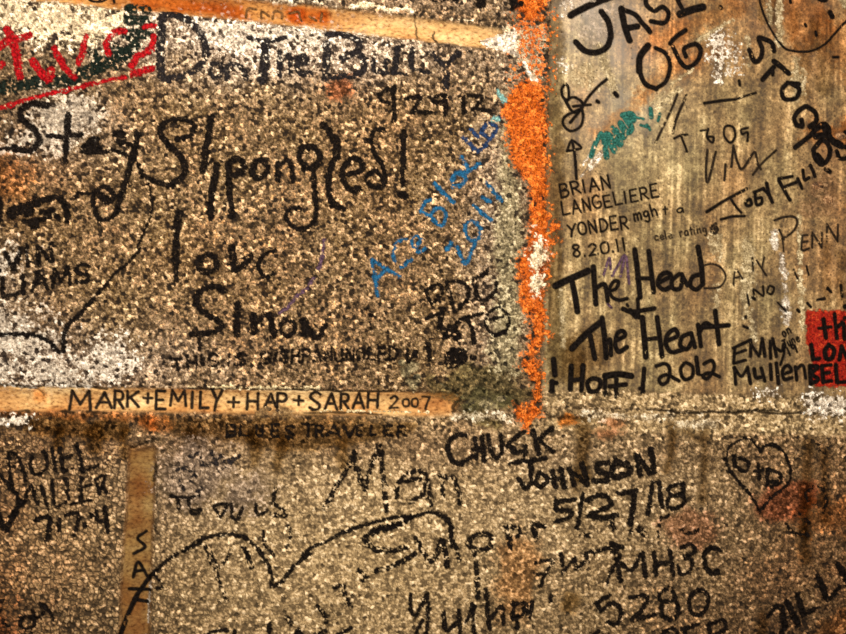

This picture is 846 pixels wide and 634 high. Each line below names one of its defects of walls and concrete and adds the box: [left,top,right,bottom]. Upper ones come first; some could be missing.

leakage [450,410,514,424]
leakage [581,410,716,428]
crack [647,408,805,416]